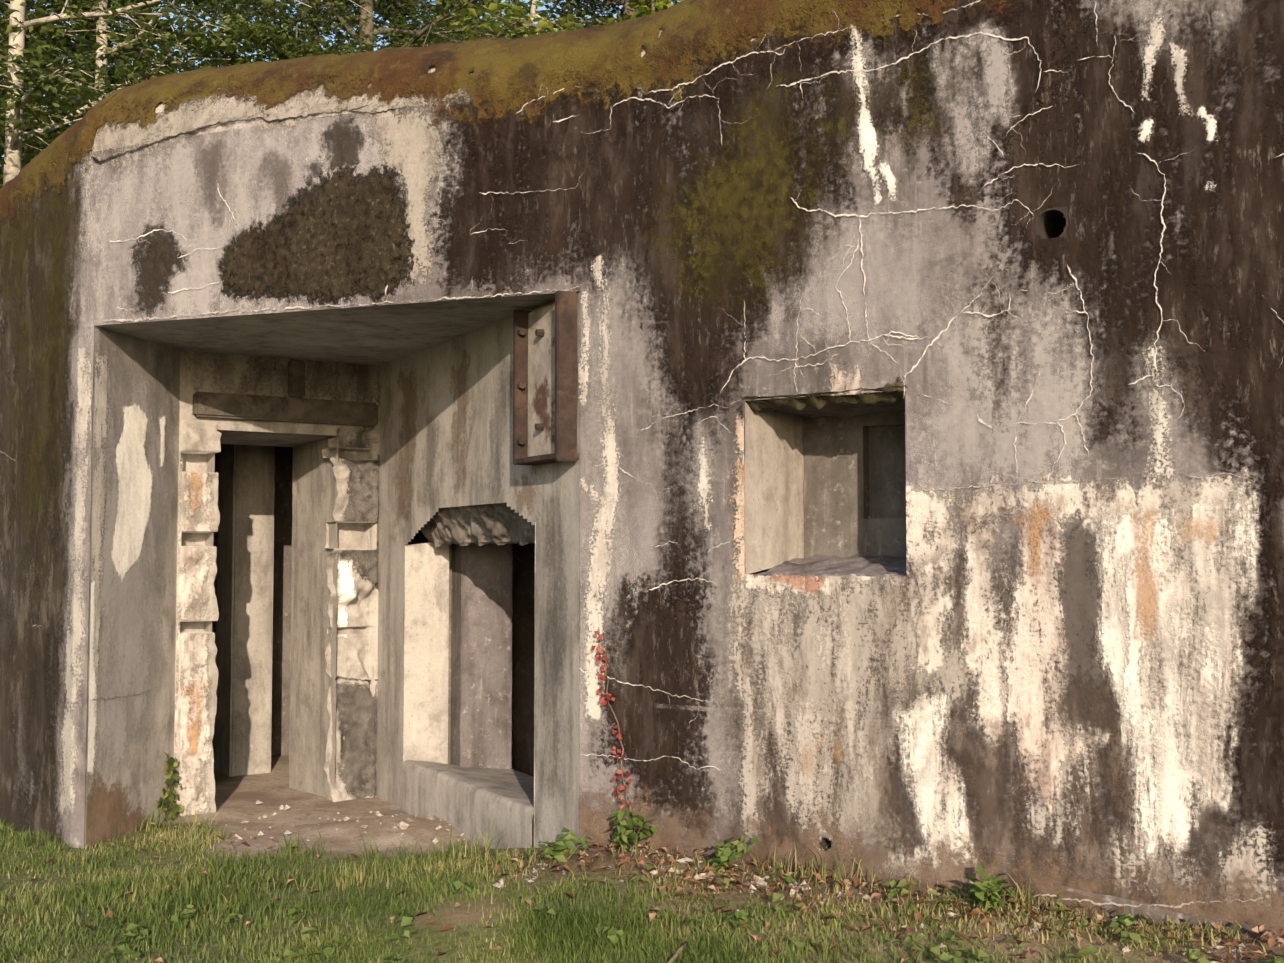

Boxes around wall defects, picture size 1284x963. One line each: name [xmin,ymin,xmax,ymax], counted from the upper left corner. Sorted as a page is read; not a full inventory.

crack [517,85,590,122]
crack [610,0,1135,478]
crack [1128,153,1176,387]
water stain [0,113,408,848]
crack [649,540,731,590]
water stain [425,0,1284,915]
rust [1026,502,1050,576]
rust [1134,514,1157,637]
crack [578,668,707,702]
crack [583,754,719,770]